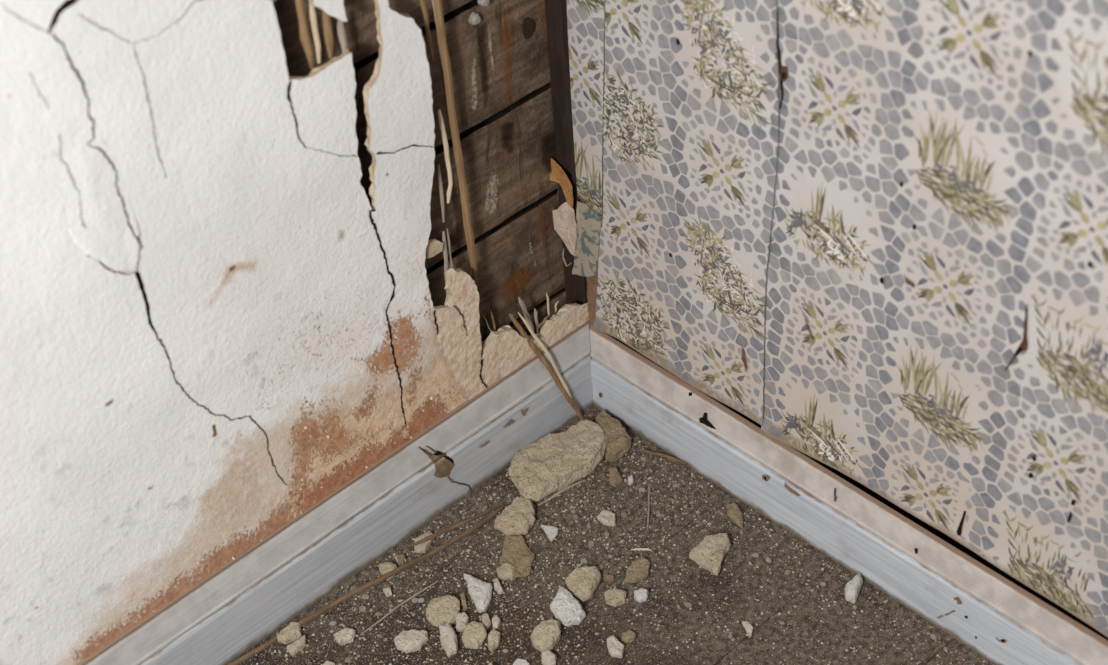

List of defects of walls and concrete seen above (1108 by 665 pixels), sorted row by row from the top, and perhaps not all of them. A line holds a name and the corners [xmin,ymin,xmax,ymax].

crack [0,0,287,485]
leakage [63,336,468,665]
flaking render [71,268,589,665]
crack [287,80,433,157]
spalling [354,0,413,211]
crack [369,210,406,427]